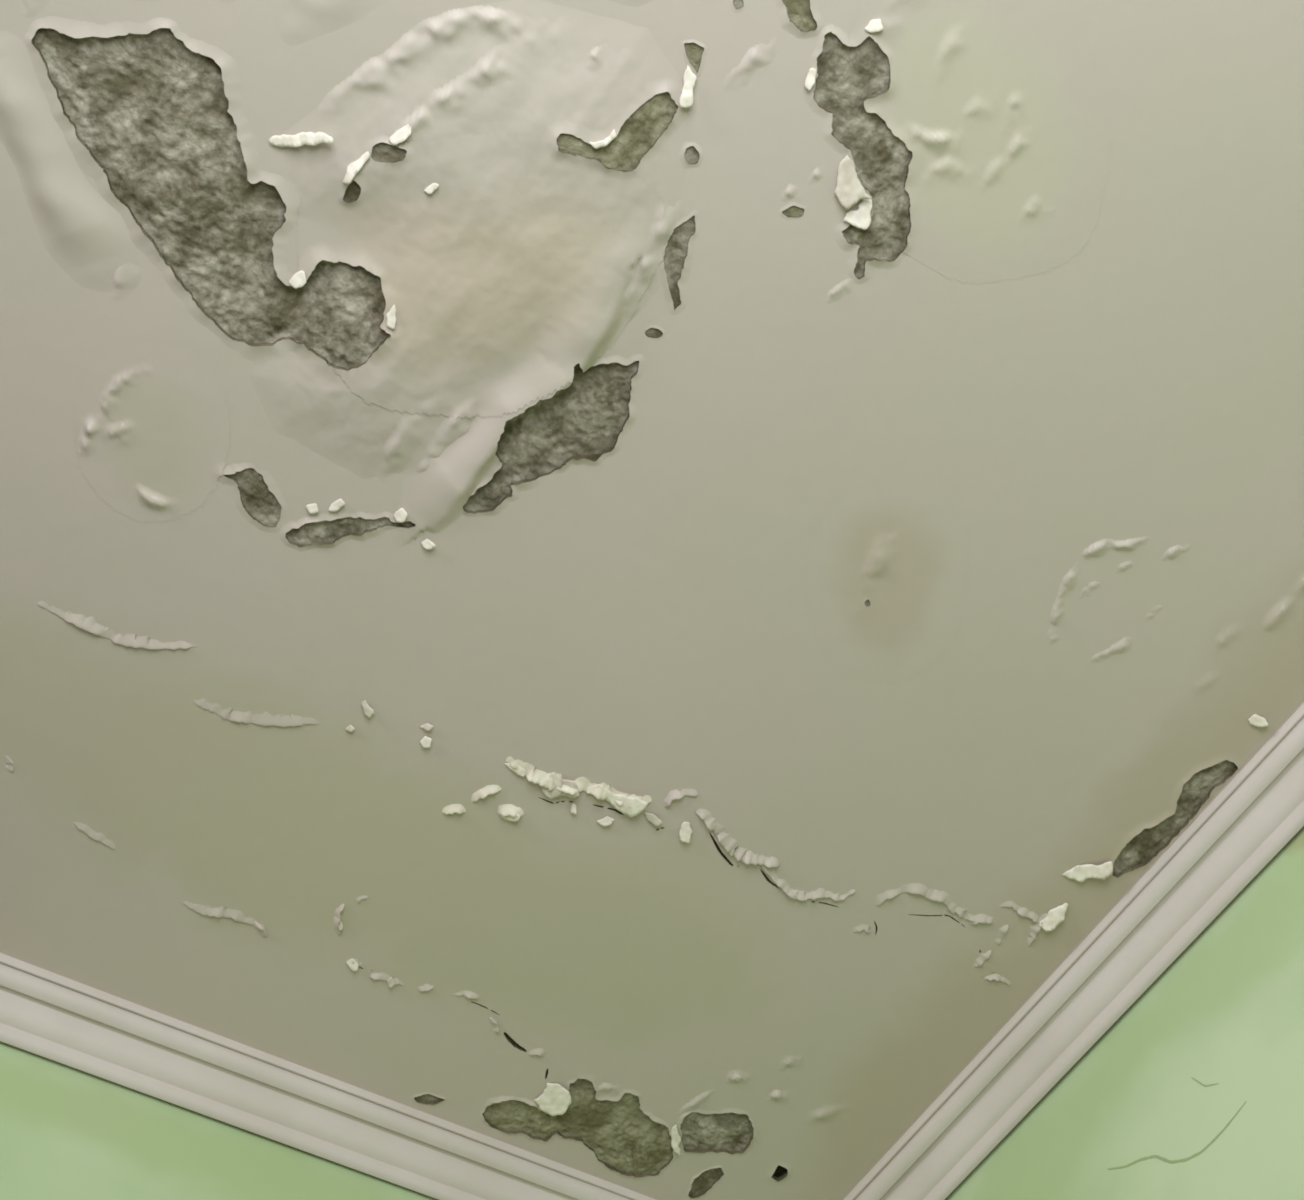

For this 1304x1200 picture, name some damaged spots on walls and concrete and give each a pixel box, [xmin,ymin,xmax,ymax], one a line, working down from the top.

peeling [729,0,746,13]
flaking render [24,16,396,385]
flaking render [343,125,411,203]
flaking render [543,39,707,177]
flaking render [775,0,913,285]
flaking render [644,210,700,340]
flaking render [462,354,646,518]
flaking render [217,462,416,552]
flaking render [421,539,436,550]
flaking render [1248,714,1268,727]
flaking render [1062,760,1241,882]
flaking render [479,1077,758,1200]